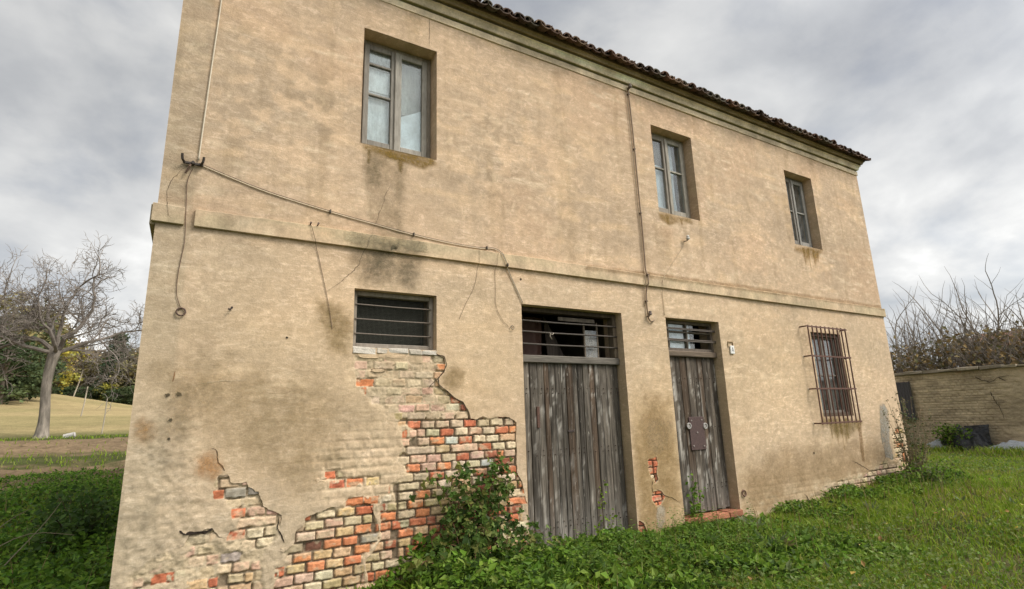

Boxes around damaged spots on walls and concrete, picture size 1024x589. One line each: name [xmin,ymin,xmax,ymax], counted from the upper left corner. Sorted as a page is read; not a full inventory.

flaking render [120,352,528,589]
flaking render [648,457,665,526]